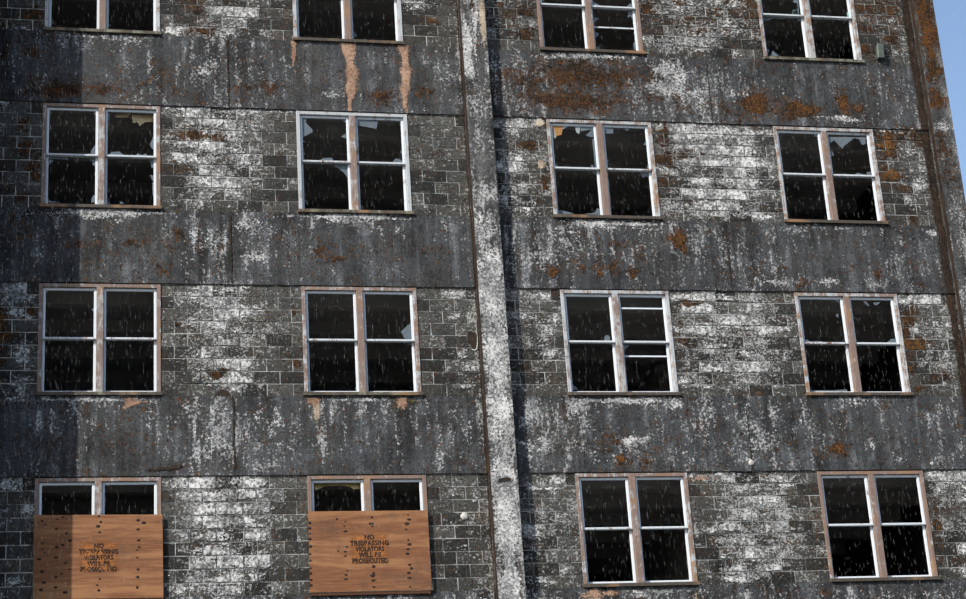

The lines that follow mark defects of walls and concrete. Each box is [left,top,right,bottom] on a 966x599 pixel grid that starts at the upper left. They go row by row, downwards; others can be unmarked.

corrosion [340,43,360,111]
corrosion [396,45,411,113]
corrosion [900,0,966,424]